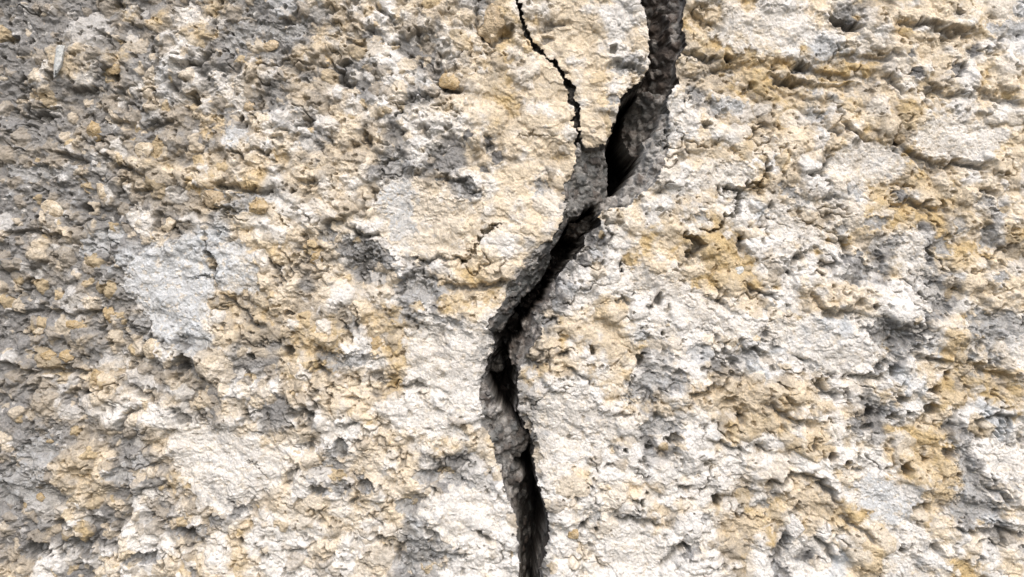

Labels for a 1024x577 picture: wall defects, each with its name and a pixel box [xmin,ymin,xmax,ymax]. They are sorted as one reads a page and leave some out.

crack [461,223,502,265]
crack [479,0,687,577]